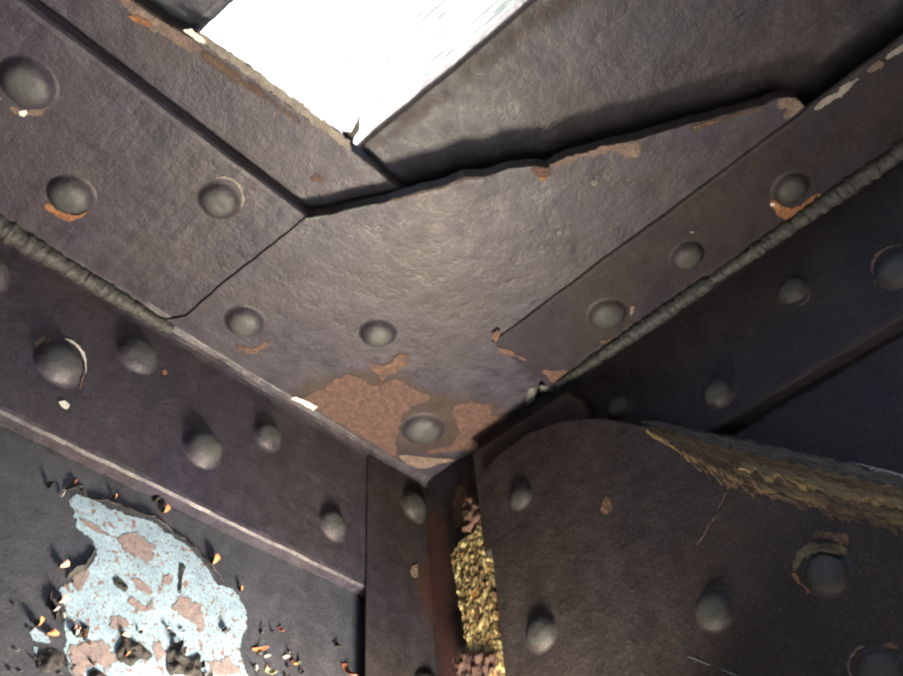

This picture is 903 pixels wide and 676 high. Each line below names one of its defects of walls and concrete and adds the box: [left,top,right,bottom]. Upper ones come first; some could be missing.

corrosion [118,0,299,122]
spalling [776,97,803,119]
spalling [814,44,903,111]
spalling [530,141,641,181]
spalling [305,177,478,221]
corrosion [769,193,818,220]
corrosion [640,420,903,594]
peeling [28,478,305,676]
corrosion [451,492,505,676]